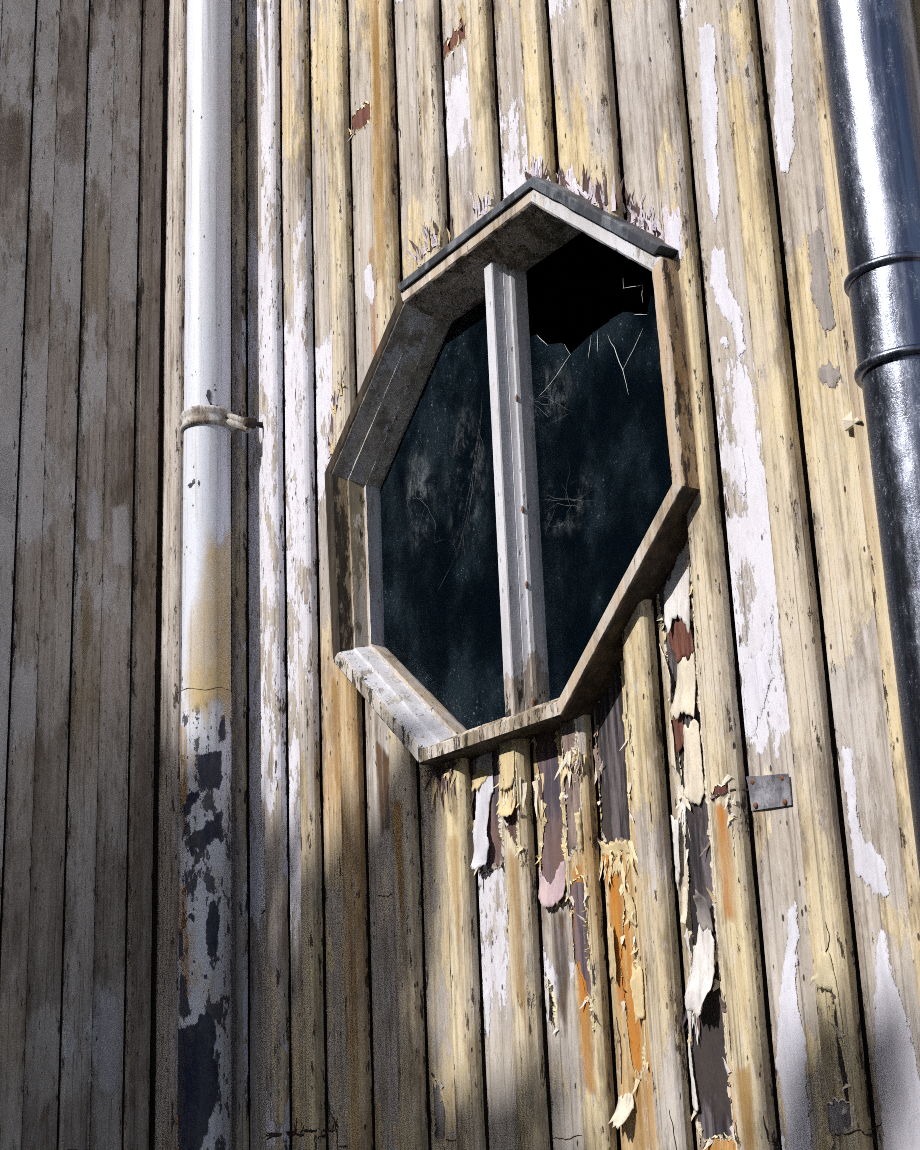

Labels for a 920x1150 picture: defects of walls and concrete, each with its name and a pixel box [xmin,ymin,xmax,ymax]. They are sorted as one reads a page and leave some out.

peeling [443,1,466,60]
peeling [348,100,371,141]
peeling [469,189,508,221]
peeling [522,152,684,264]
peeling [405,215,453,267]
peeling [656,537,738,1150]
peeling [423,661,649,1129]
crack [266,1107,348,1150]
peeling [431,1072,447,1142]